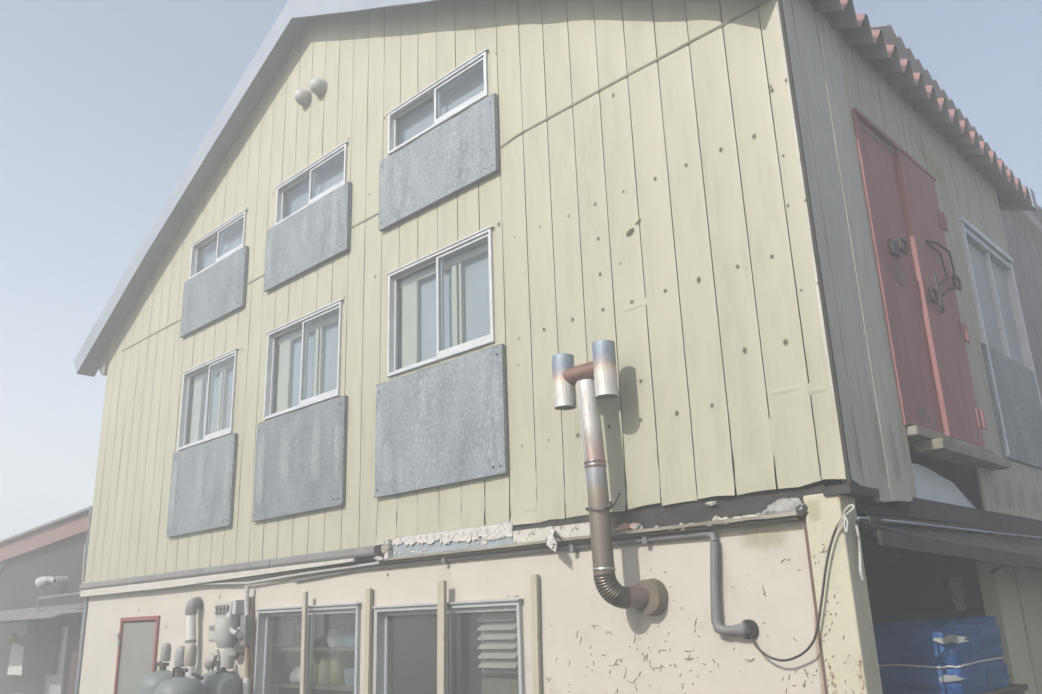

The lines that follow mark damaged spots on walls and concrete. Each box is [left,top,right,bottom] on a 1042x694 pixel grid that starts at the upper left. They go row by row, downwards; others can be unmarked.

peeling [610,486,804,532]
peeling [384,515,589,559]